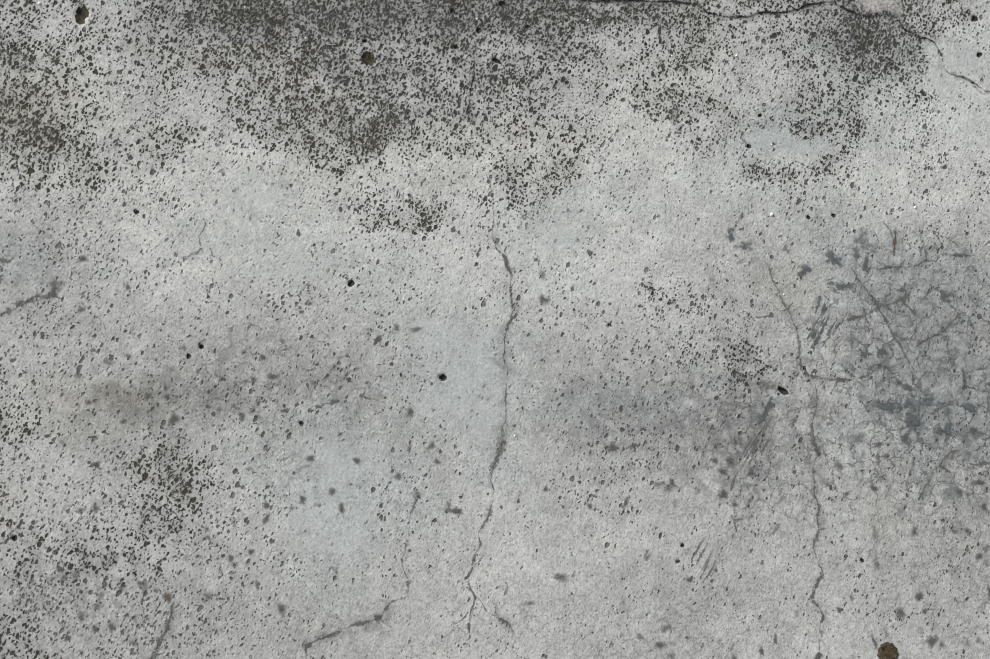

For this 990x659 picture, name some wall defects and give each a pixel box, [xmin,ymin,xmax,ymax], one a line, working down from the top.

crack [580,0,981,88]
crack [467,48,513,363]
crack [962,367,986,392]
crack [462,393,510,630]
crack [757,232,971,659]
crack [906,450,988,500]
corrosion [877,642,899,659]